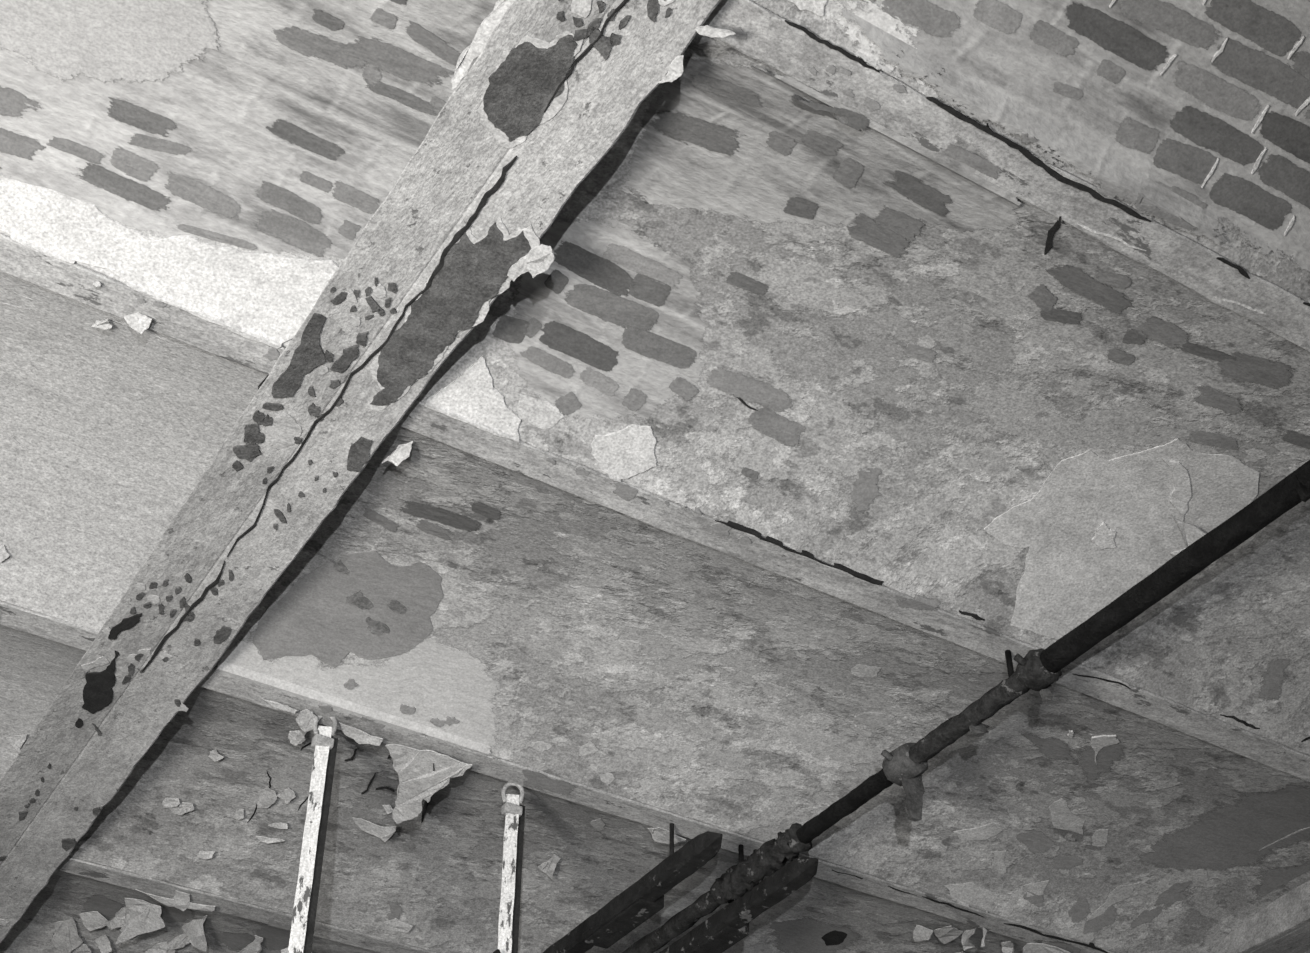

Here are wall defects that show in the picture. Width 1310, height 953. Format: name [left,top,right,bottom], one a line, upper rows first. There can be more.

flaking render [0,0,498,260]
crack [544,0,628,113]
flaking render [610,55,1021,258]
crack [785,20,1151,222]
flaking render [837,0,1310,272]
crack [137,156,517,672]
flaking render [493,217,806,448]
crack [1217,257,1250,279]
flaking render [252,550,443,668]
crack [546,457,985,621]
peeling [262,698,472,842]
crack [832,870,1108,953]